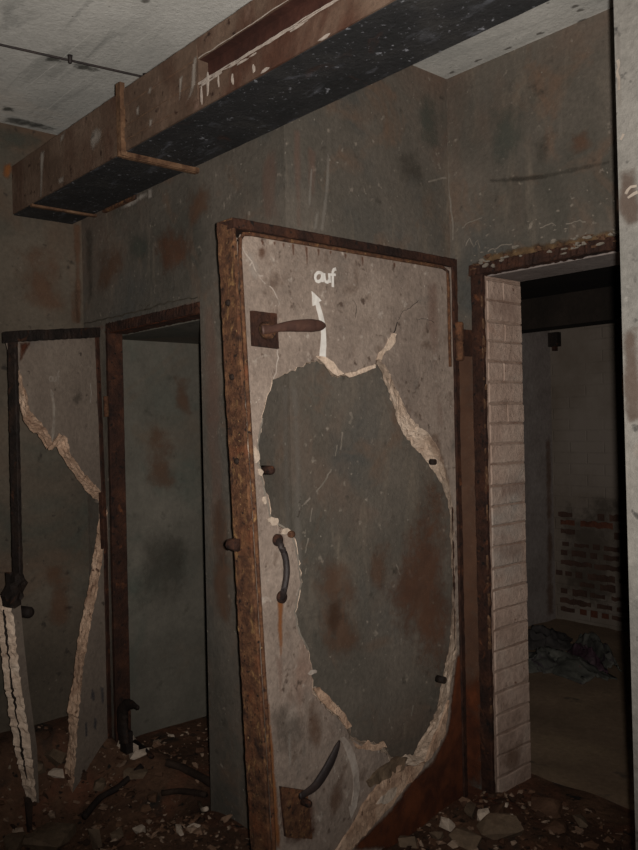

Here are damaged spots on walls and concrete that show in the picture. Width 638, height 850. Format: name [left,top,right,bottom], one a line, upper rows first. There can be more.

crack [0,595,36,802]
spalling [248,322,457,850]
rust [356,356,481,849]